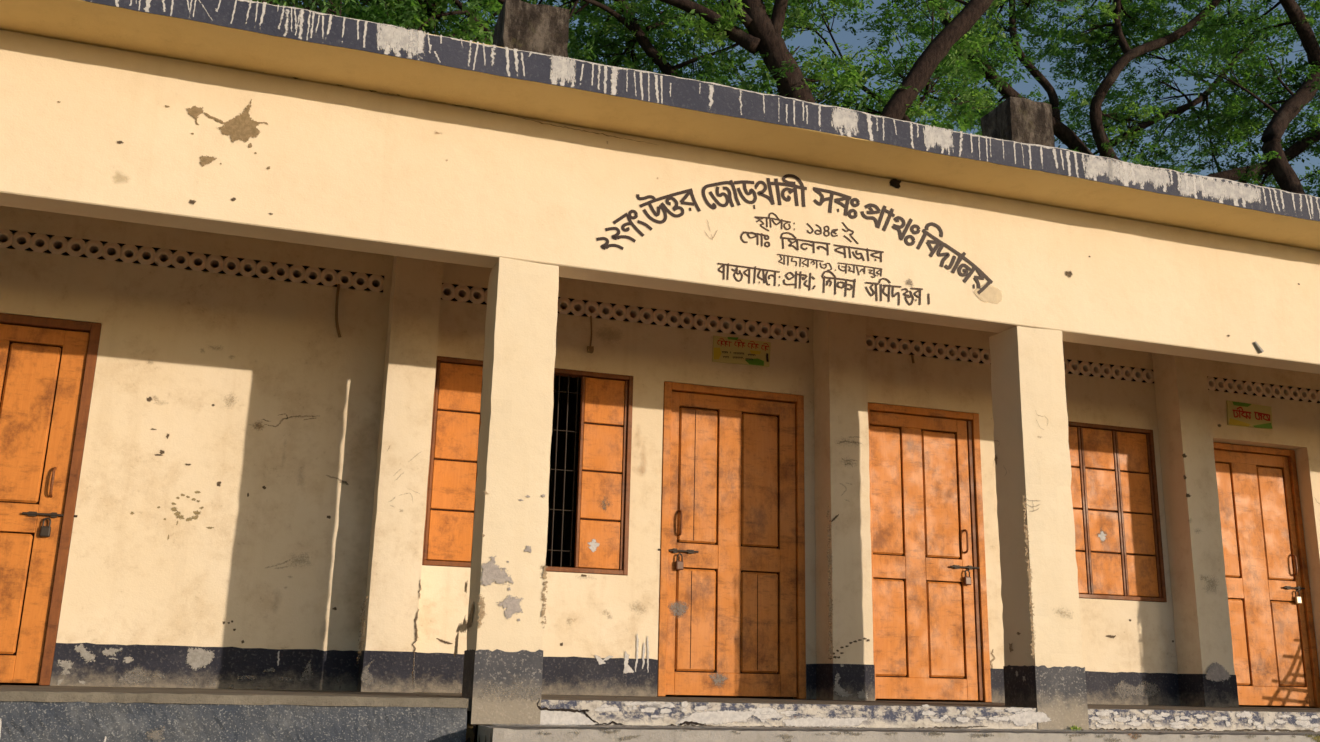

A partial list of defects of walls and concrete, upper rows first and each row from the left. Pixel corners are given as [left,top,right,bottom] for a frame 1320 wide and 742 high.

leakage [245,0,360,42]
leakage [376,23,441,63]
leakage [468,40,532,76]
leakage [550,54,672,104]
leakage [786,100,859,137]
leakage [916,123,1320,219]
peeling [454,556,523,657]
spalling [540,566,548,628]
spalling [827,506,870,700]
peeling [57,644,165,686]
peeling [184,647,313,690]
peeling [492,681,1320,739]